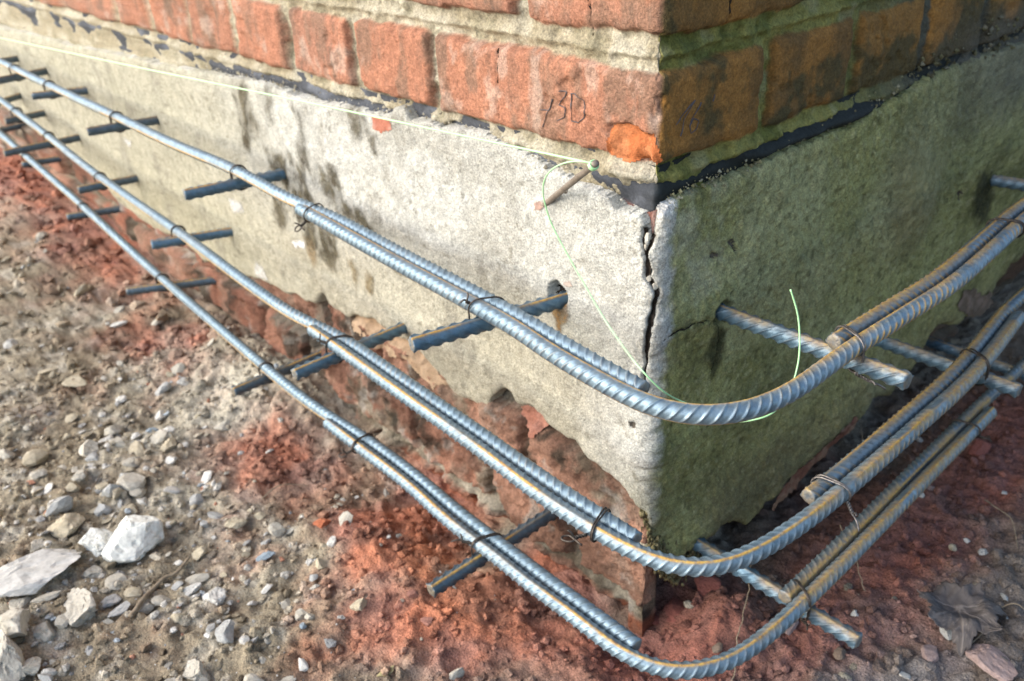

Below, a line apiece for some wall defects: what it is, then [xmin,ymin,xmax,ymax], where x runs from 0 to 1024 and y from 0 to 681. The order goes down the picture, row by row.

water stain [232,85,257,149]
water stain [347,108,376,154]
water stain [266,148,337,271]
water stain [320,165,370,230]
water stain [975,173,993,221]
water stain [350,261,373,293]
crack [642,227,707,380]
spalling [352,315,448,390]
water stain [708,329,726,375]
spalling [521,405,549,439]